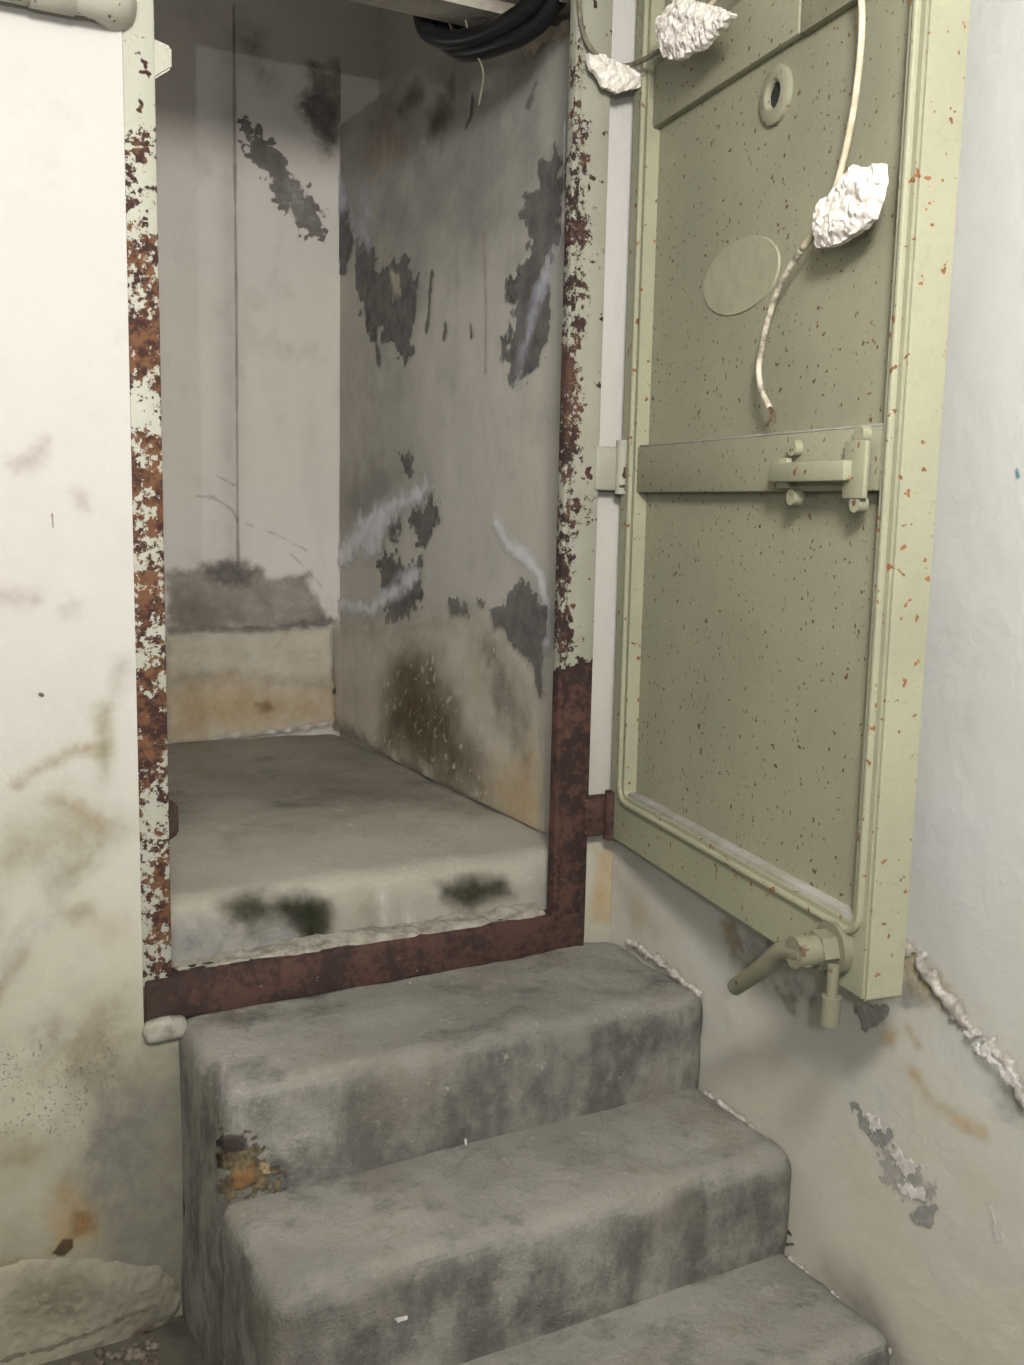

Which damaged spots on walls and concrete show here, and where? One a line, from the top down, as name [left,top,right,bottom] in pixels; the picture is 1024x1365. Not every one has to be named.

peeling [237,115,447,366]
peeling [500,142,567,388]
peeling [398,451,414,479]
peeling [376,491,440,625]
damp [390,668,470,780]
damp [229,896,327,936]
damp [444,878,506,905]
peeling [854,1002,889,1032]
spalling [904,943,1024,1108]
spalling [215,1126,286,1203]
peeling [849,1102,938,1228]